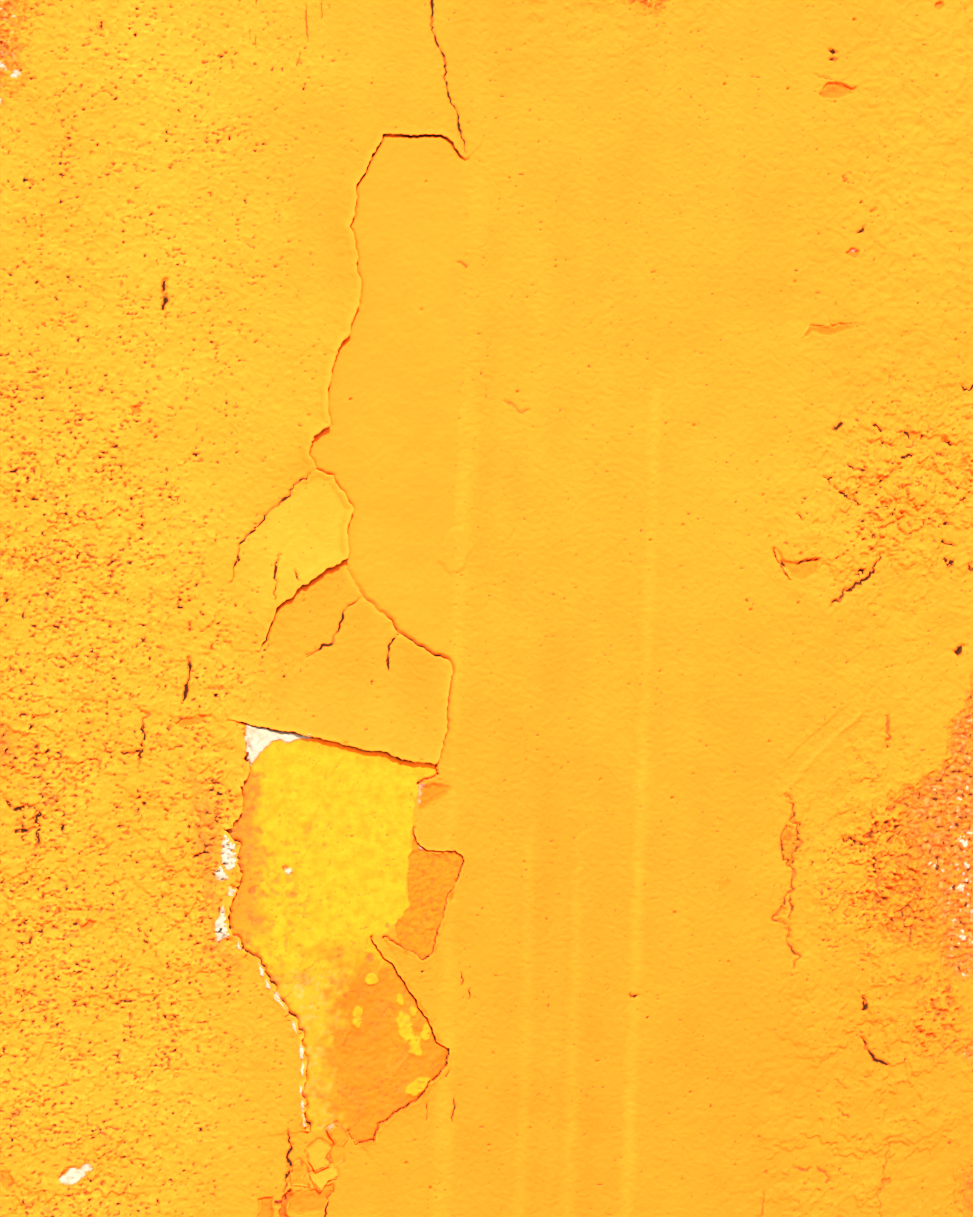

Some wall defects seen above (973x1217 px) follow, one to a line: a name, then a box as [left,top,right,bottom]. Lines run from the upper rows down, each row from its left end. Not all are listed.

crack [429,0,466,153]
peeling [774,383,973,616]
peeling [215,724,468,1192]
peeling [783,672,973,1072]